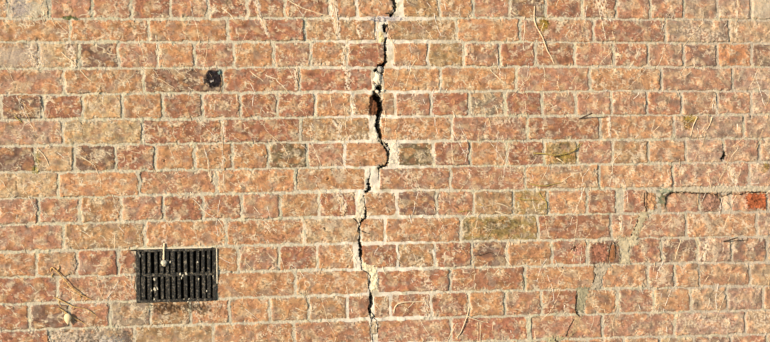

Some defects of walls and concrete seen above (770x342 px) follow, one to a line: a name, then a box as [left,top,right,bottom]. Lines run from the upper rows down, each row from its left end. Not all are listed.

crack [353,5,400,342]
crack [547,192,650,342]